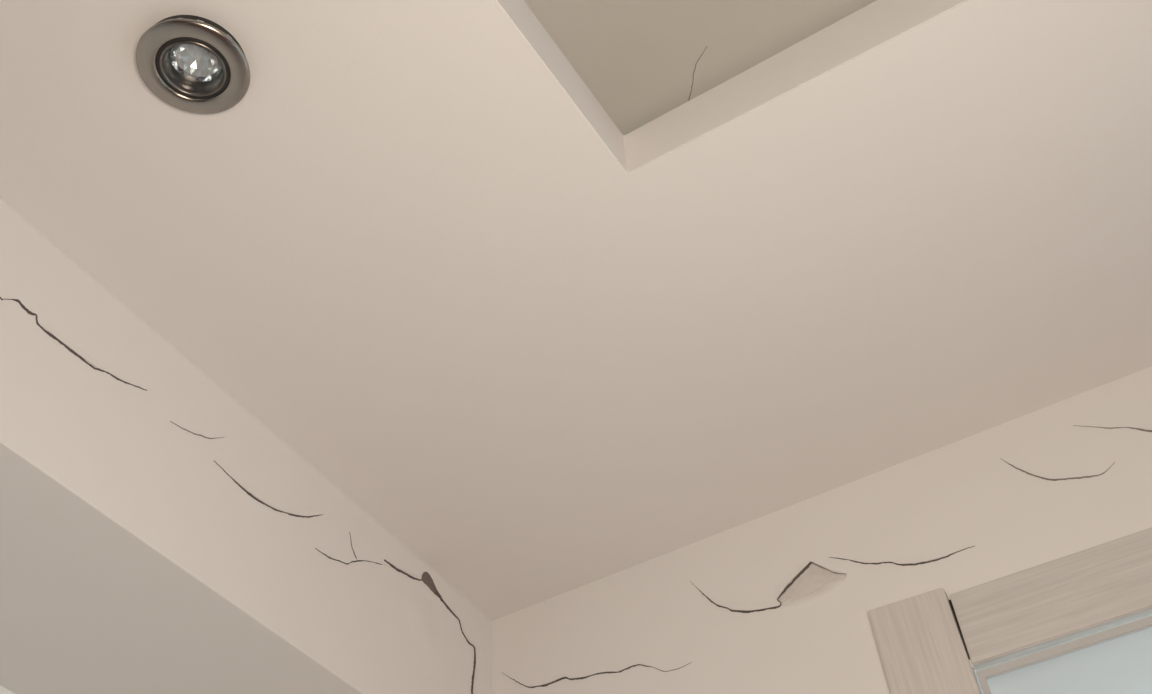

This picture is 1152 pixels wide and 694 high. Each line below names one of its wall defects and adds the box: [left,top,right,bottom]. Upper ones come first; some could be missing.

crack [0,293,147,391]
crack [1073,421,1152,432]
crack [170,420,323,518]
crack [1001,457,1115,481]
crack [829,544,975,566]
crack [315,532,691,694]
flaking render [690,559,847,613]